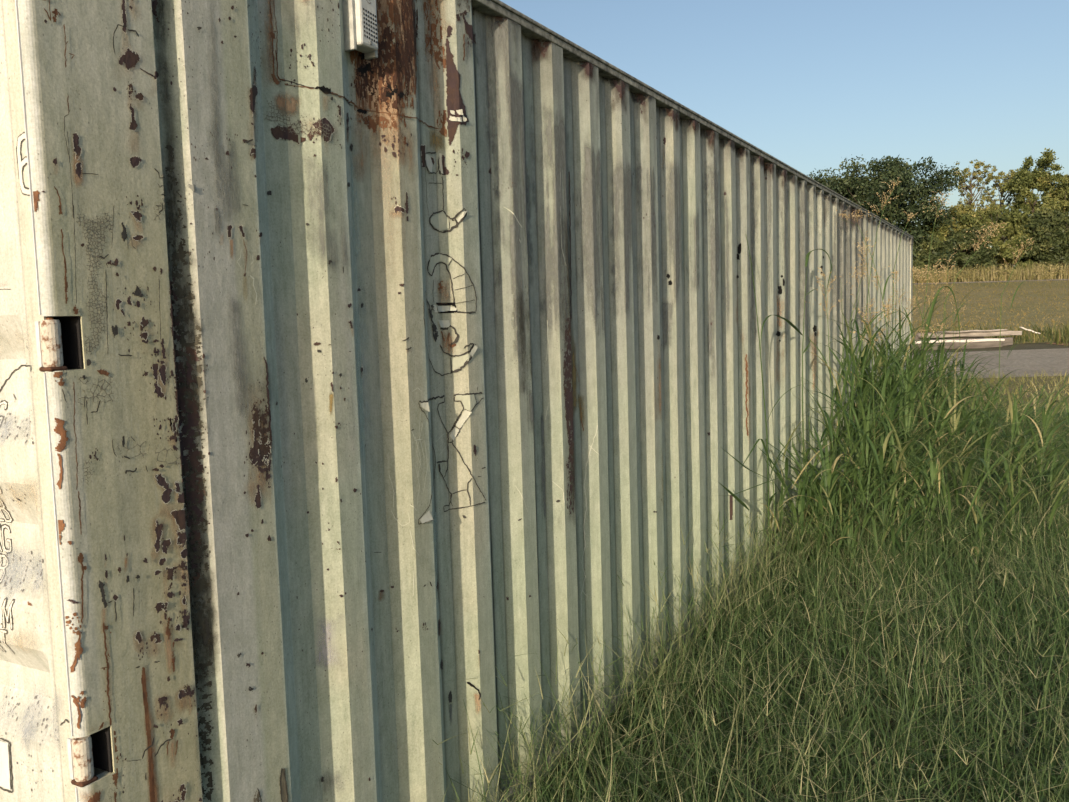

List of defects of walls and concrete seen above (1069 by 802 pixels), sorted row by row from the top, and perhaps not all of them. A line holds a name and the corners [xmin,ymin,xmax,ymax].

corrosion [266,0,297,113]
corrosion [353,0,447,160]
peeling [431,211,467,230]
crack [64,96,179,482]
crack [278,78,486,524]
peeling [433,305,457,327]
peeling [448,344,478,371]
peeling [450,394,476,441]
corrosion [53,372,87,672]
corrosion [165,617,175,672]
corrosion [71,691,87,729]
corrosion [141,667,158,802]